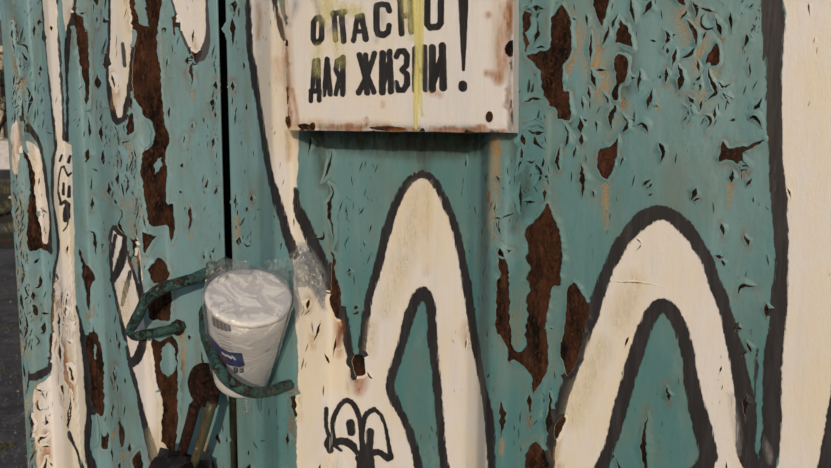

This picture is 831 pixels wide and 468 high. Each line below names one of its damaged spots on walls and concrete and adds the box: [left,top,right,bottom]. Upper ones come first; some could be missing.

peeling [7,19,27,78]
peeling [519,0,578,124]
peeling [589,0,638,106]
peeling [669,0,724,70]
peeling [11,91,53,269]
peeling [593,132,623,185]
peeling [713,134,769,171]
peeling [488,200,593,397]
peeling [45,244,148,468]